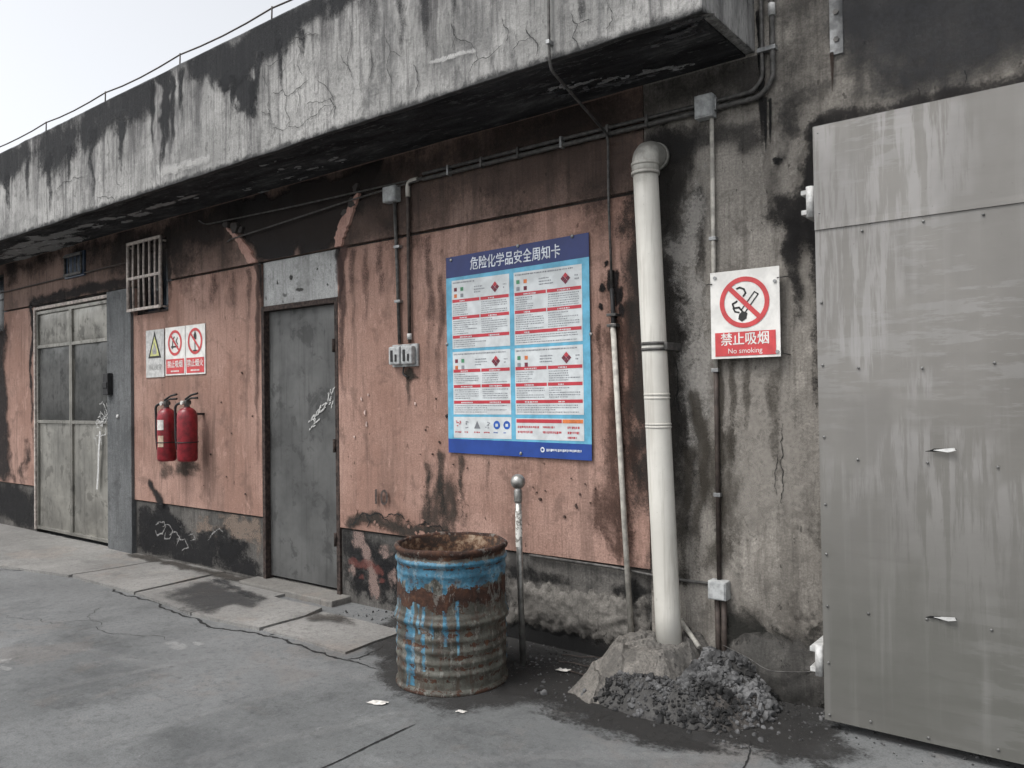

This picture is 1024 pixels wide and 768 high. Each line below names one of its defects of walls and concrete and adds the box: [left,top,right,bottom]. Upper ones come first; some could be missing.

damp [0,0,376,205]
crack [260,27,419,131]
crack [451,19,538,72]
damp [756,10,824,202]
spalling [222,222,258,264]
spalling [334,183,361,248]
damp [780,219,817,363]
damp [653,124,750,584]
crack [774,425,784,504]
damp [137,480,266,613]
peeling [345,509,448,599]
crack [1,589,380,670]